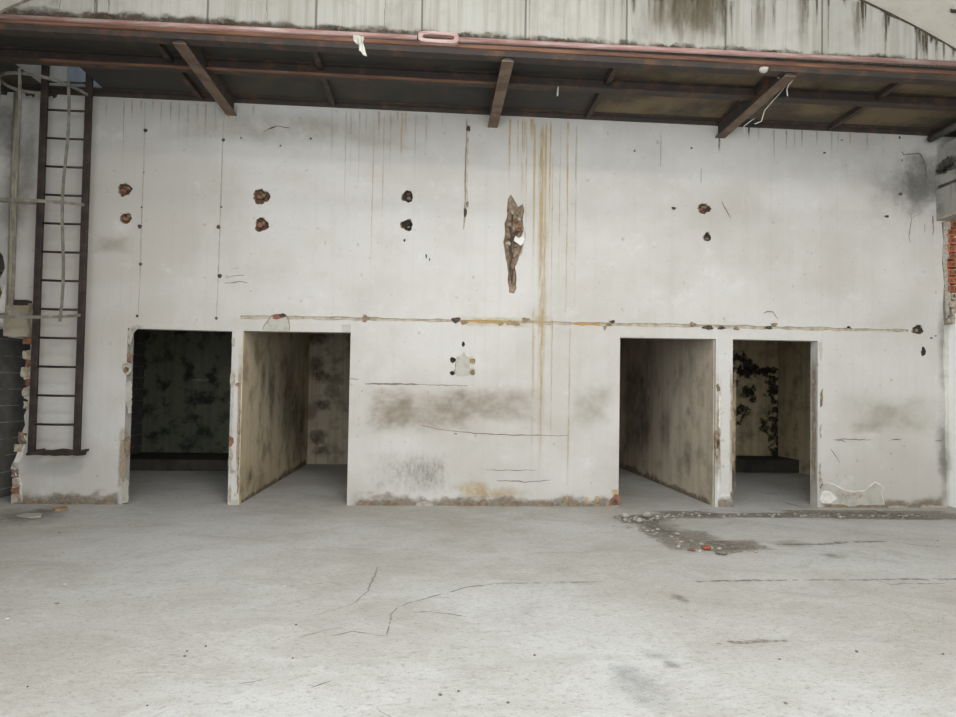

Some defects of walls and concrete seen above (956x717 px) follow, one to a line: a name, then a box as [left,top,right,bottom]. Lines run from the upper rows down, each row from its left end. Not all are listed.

water stain [856,0,866,25]
water stain [915,28,945,54]
corrosion [531,120,551,228]
flaking render [503,195,526,293]
flaking render [938,212,956,325]
spalling [0,252,33,409]
water stain [733,351,779,456]
spalling [11,431,129,505]
corrosion [586,490,620,505]
flaking render [819,463,946,508]